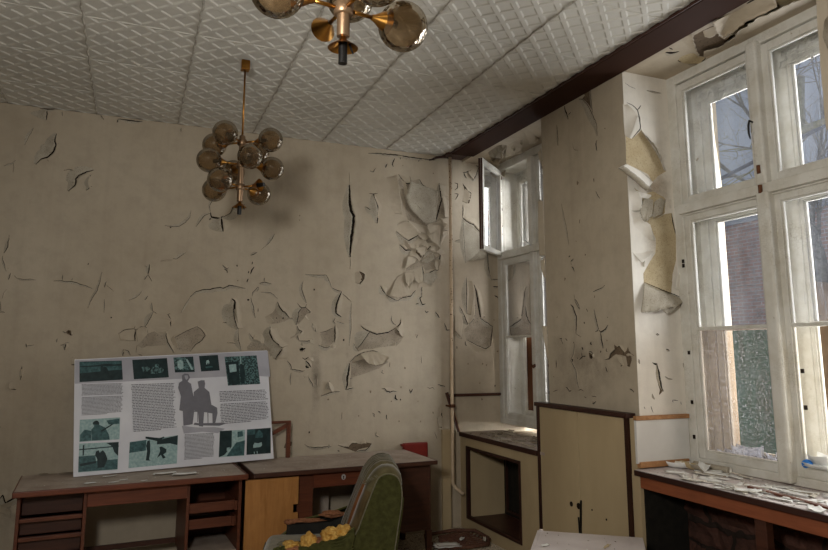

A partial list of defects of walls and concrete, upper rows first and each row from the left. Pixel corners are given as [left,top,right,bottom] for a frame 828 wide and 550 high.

peeling [678,0,828,131]
peeling [488,132,542,177]
crack [0,238,112,318]
peeling [118,302,208,356]
crack [181,233,278,318]
peeling [222,272,339,361]
crack [342,158,403,269]
peeling [350,316,405,378]
peeling [365,161,498,302]
peeling [450,277,494,354]
crack [553,285,608,405]
peeling [618,103,682,314]